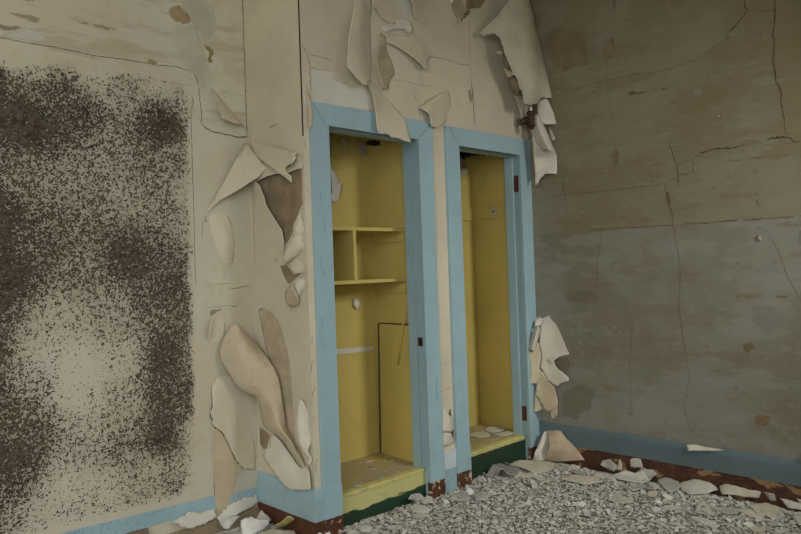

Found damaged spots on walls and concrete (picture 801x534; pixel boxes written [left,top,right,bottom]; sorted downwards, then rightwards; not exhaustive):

damp [0,60,196,534]
peeling [174,308,312,534]
peeling [206,141,305,306]
peeling [329,134,343,202]
peeling [306,0,485,143]
peeling [480,0,557,186]
peeling [529,316,569,419]
crack [551,0,798,300]